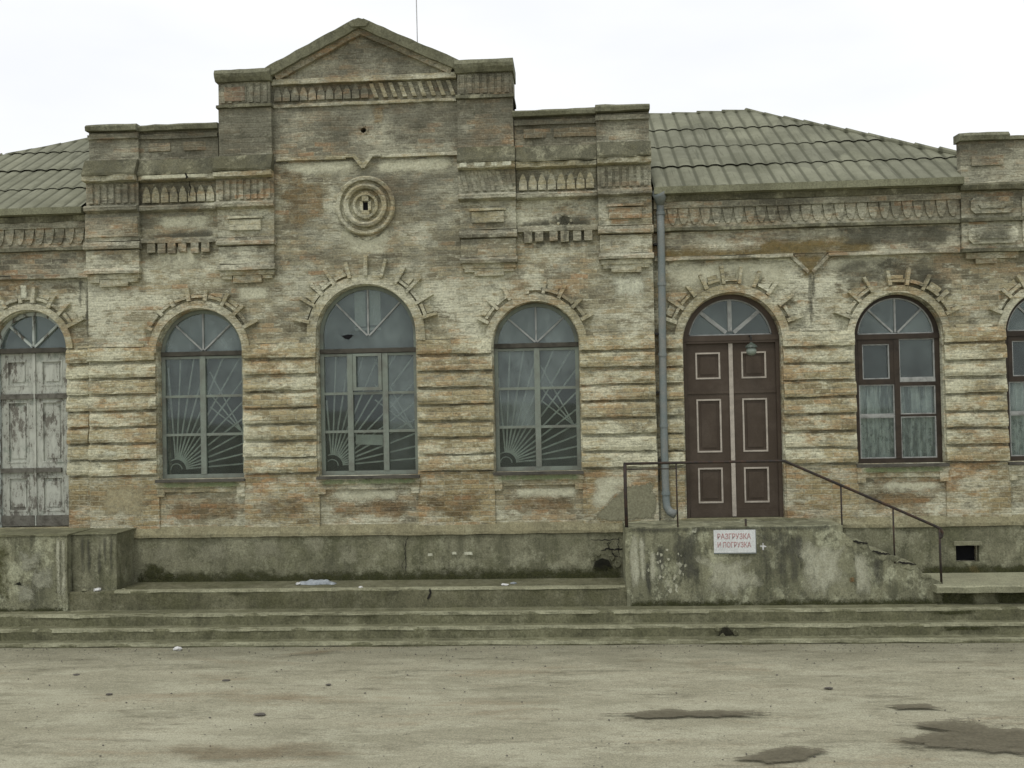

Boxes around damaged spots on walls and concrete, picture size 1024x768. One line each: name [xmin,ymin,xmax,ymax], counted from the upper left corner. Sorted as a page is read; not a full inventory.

water stain [630,534,761,594]